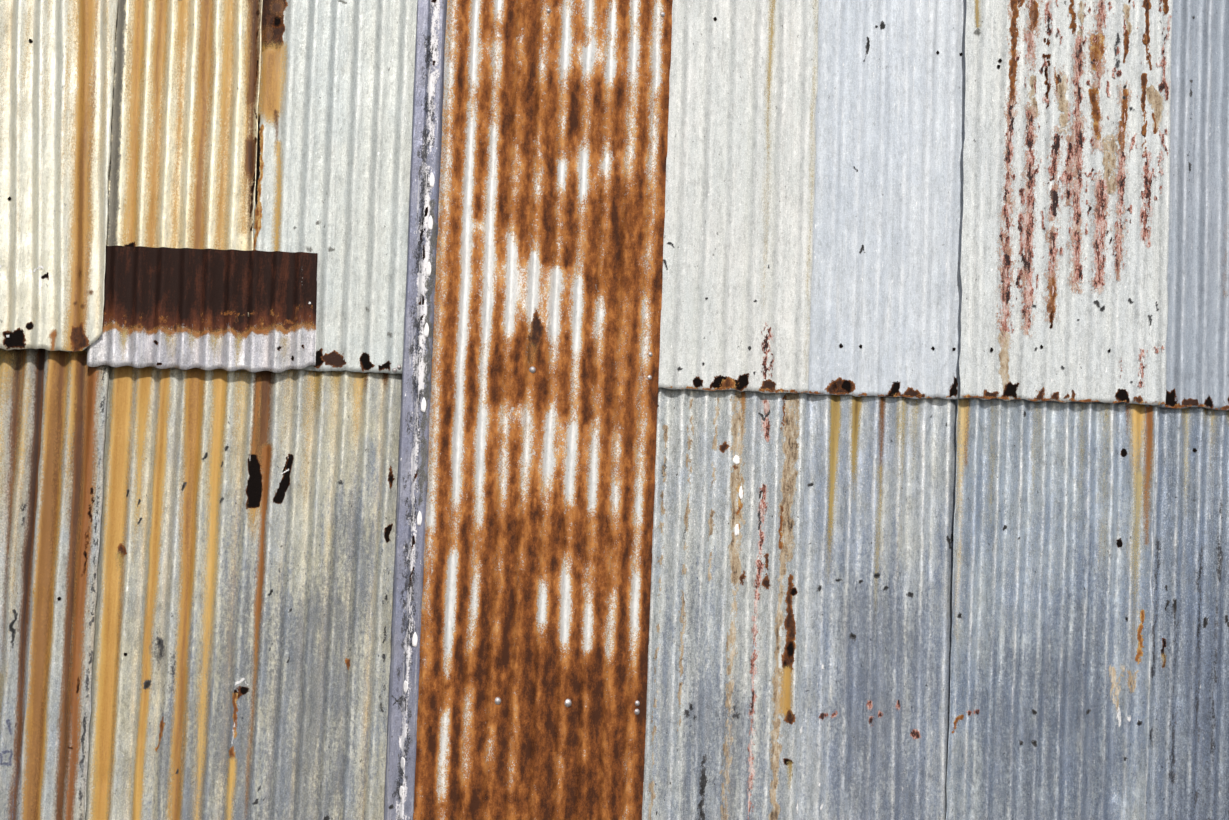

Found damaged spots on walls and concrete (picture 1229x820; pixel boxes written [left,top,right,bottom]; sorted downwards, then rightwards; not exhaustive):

rust [1056,72,1070,134]
rust [1123,0,1169,248]
rust [0,0,365,820]
rust [413,0,728,820]
rust [749,344,1229,586]
rust [867,700,901,726]
rust [952,709,979,733]
rust [1135,610,1145,664]